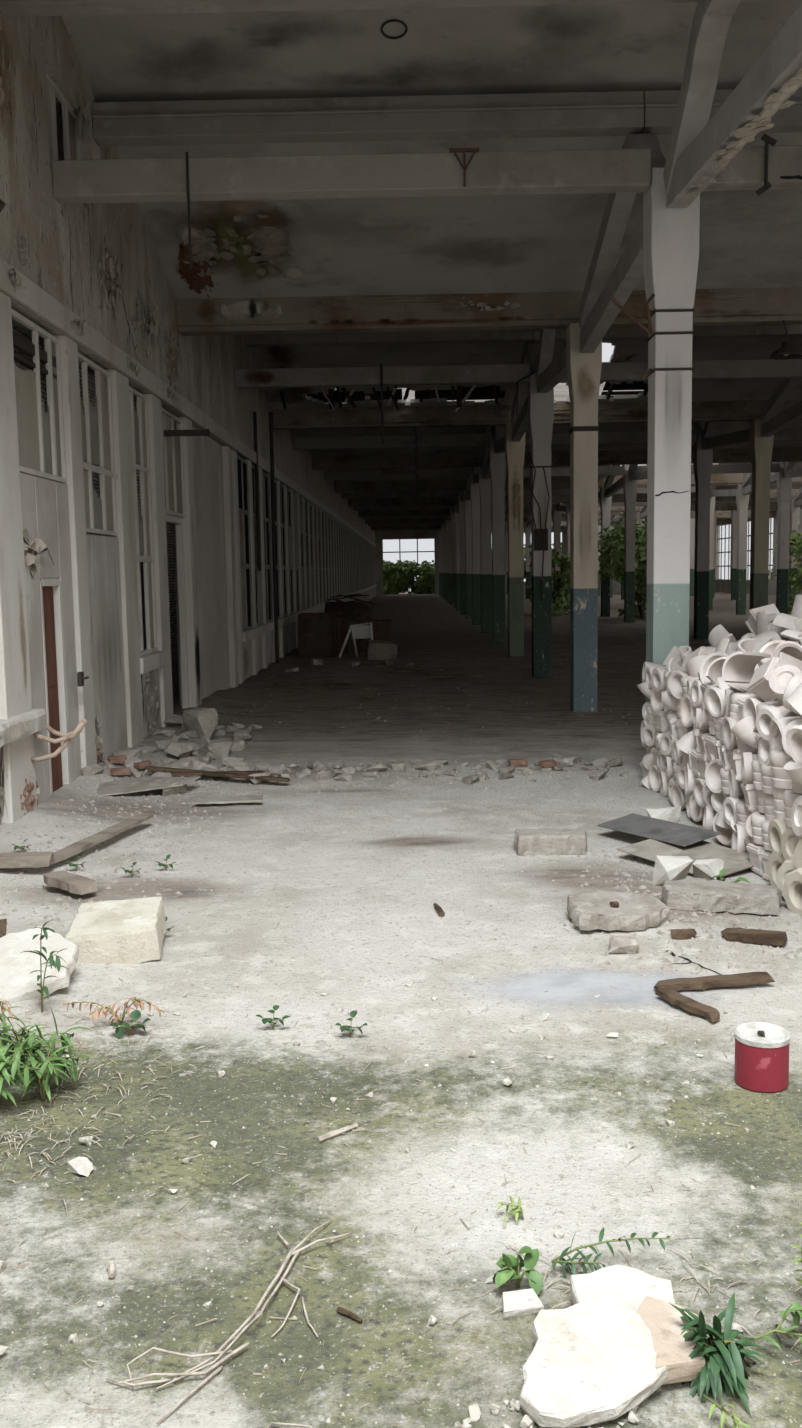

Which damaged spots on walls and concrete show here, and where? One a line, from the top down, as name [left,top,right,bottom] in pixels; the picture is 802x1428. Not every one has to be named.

peeling [686,69,802,197]
peeling [178,214,293,298]
spalling [0,735,41,822]